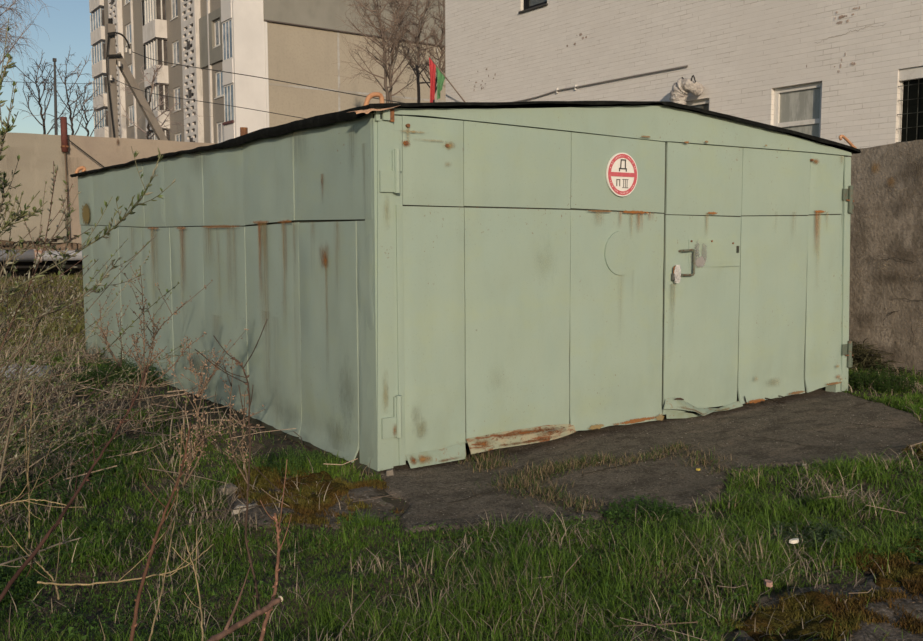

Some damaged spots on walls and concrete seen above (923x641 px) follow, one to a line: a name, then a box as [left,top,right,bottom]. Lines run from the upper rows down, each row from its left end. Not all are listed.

rust [498,429,556,445]